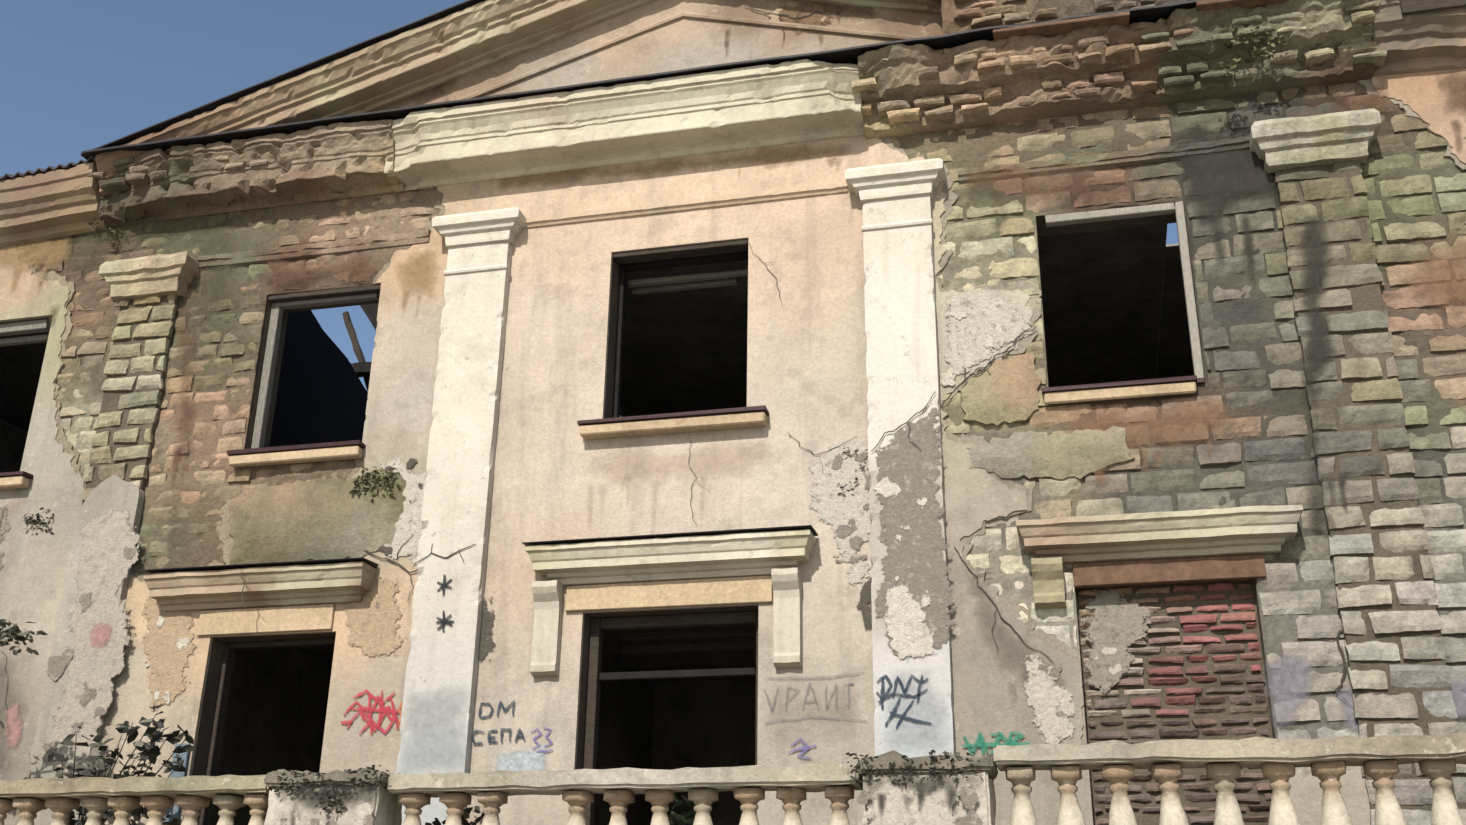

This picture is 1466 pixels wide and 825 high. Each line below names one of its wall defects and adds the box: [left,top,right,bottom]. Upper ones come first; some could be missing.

leakage [1446,75,1466,141]
crack [749,243,782,303]
leakage [1303,217,1330,389]
crack [788,327,1037,467]
spalling [809,79,1466,745]
spalling [17,187,445,774]
crack [688,437,710,522]
leakage [1311,473,1346,523]
crack [363,534,476,602]
spalling [1295,767,1311,778]